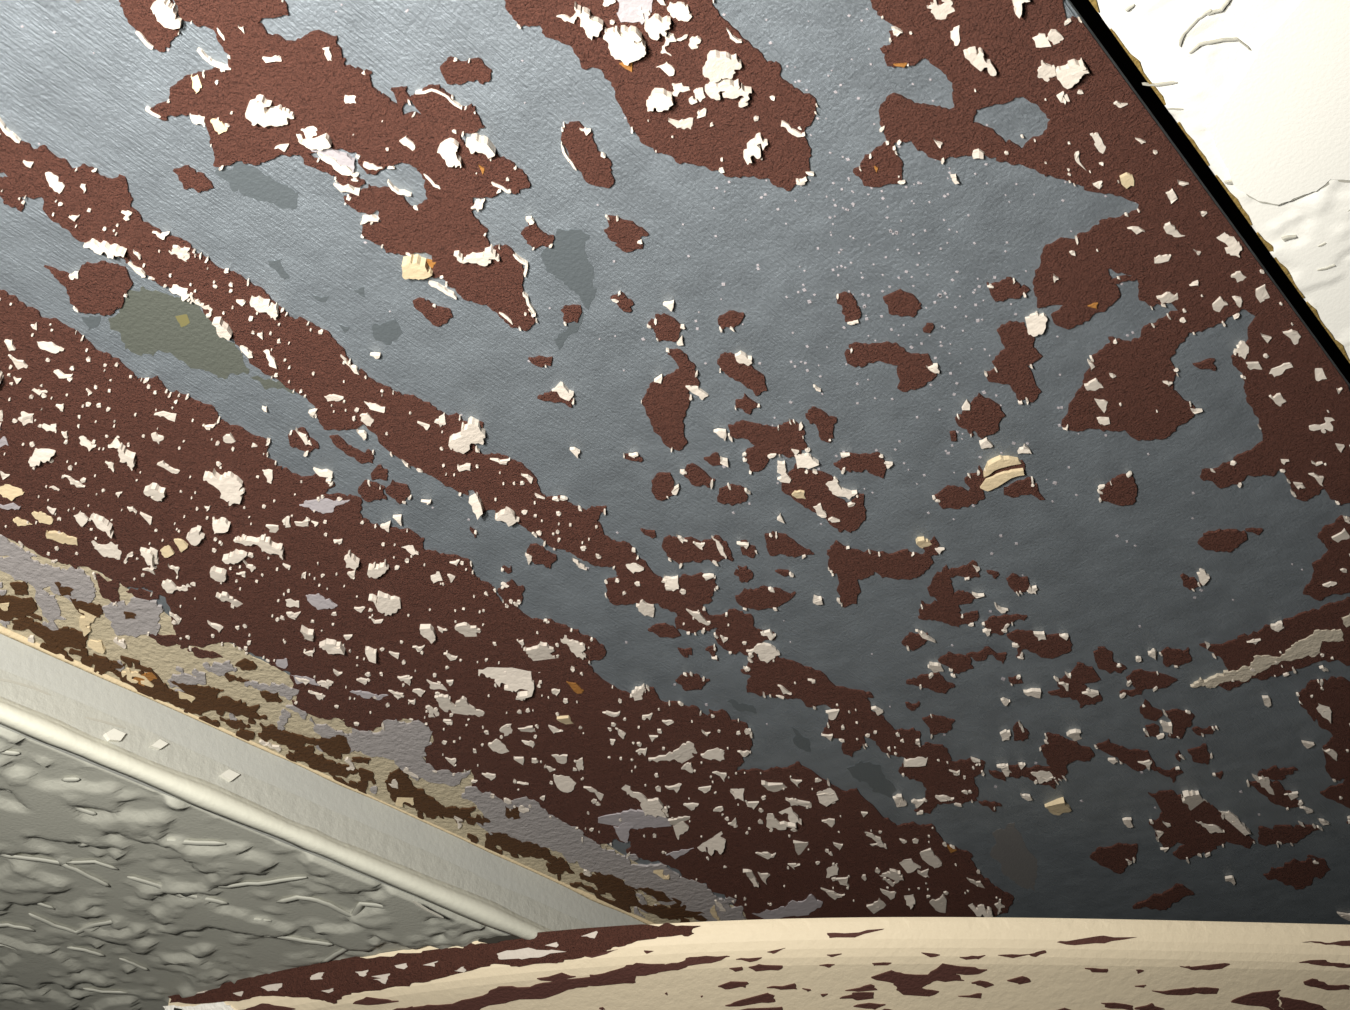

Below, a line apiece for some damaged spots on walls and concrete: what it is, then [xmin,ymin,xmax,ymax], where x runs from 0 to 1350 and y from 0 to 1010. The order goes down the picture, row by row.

peeling [927,0,996,76]
peeling [1032,29,1089,89]
crack [1142,0,1250,110]
peeling [245,94,412,196]
peeling [437,132,496,168]
crack [1246,180,1350,271]
peeling [454,244,535,313]
peeling [0,484,122,560]
peeling [140,469,284,607]
peeling [344,550,401,616]
peeling [478,635,586,701]
peeling [552,754,726,879]